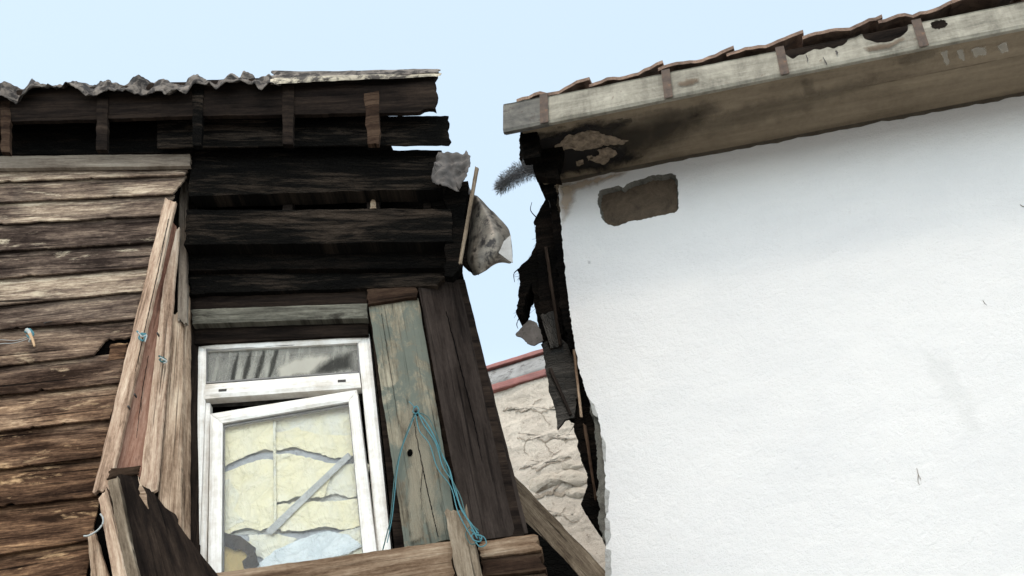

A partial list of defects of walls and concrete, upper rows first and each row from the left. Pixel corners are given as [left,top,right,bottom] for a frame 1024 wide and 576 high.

peeling [555,130,629,166]
spalling [597,173,679,226]
spalling [549,199,577,356]
crack [503,398,587,523]
spalling [590,401,612,576]